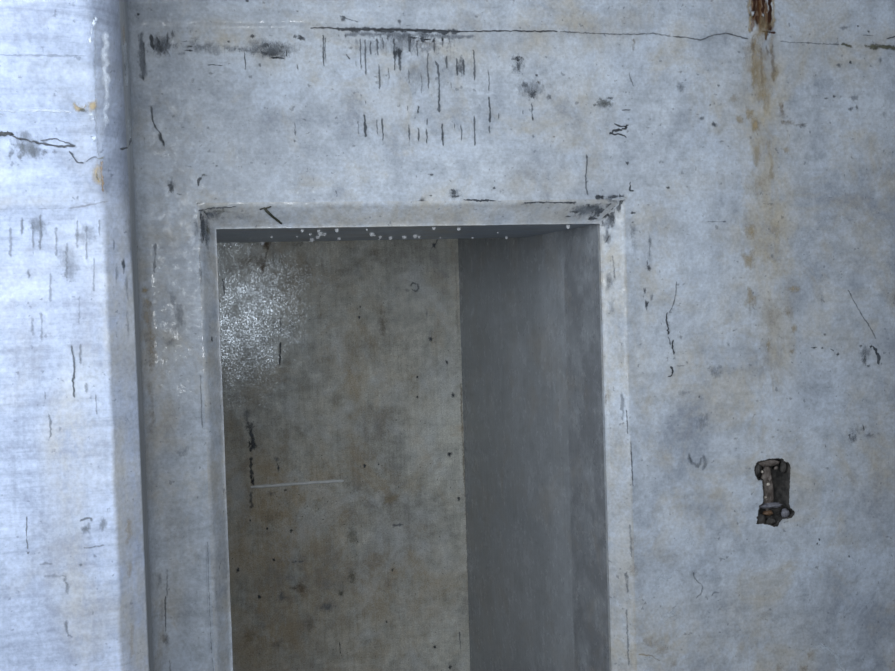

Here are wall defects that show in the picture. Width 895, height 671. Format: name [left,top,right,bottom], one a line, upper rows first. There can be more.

rust [748,0,776,40]
crack [311,27,557,35]
crack [673,33,748,41]
crack [781,36,895,50]
crack [0,131,95,164]